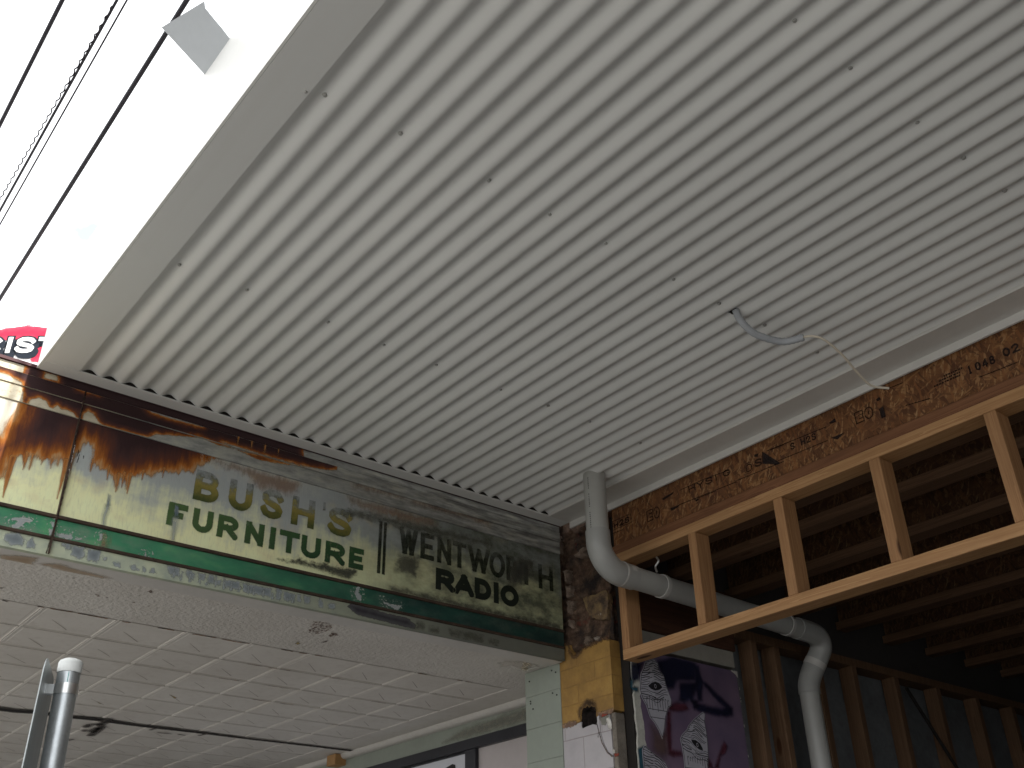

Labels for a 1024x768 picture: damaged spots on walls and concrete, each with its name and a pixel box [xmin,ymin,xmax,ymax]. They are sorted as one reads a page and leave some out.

corrosion [0,366,337,498]
peeling [4,515,107,546]